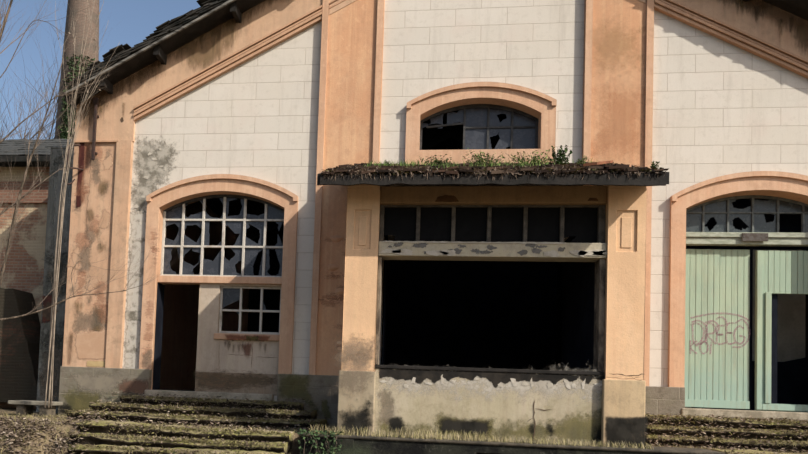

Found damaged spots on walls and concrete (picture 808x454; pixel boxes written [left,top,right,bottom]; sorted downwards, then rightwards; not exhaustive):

damp [732,0,808,49]
rust [76,143,89,208]
peeling [71,138,177,393]
peeling [381,241,607,257]
flaking render [379,368,605,400]
damp [340,402,447,435]
spalling [437,416,493,436]
damp [463,409,648,448]